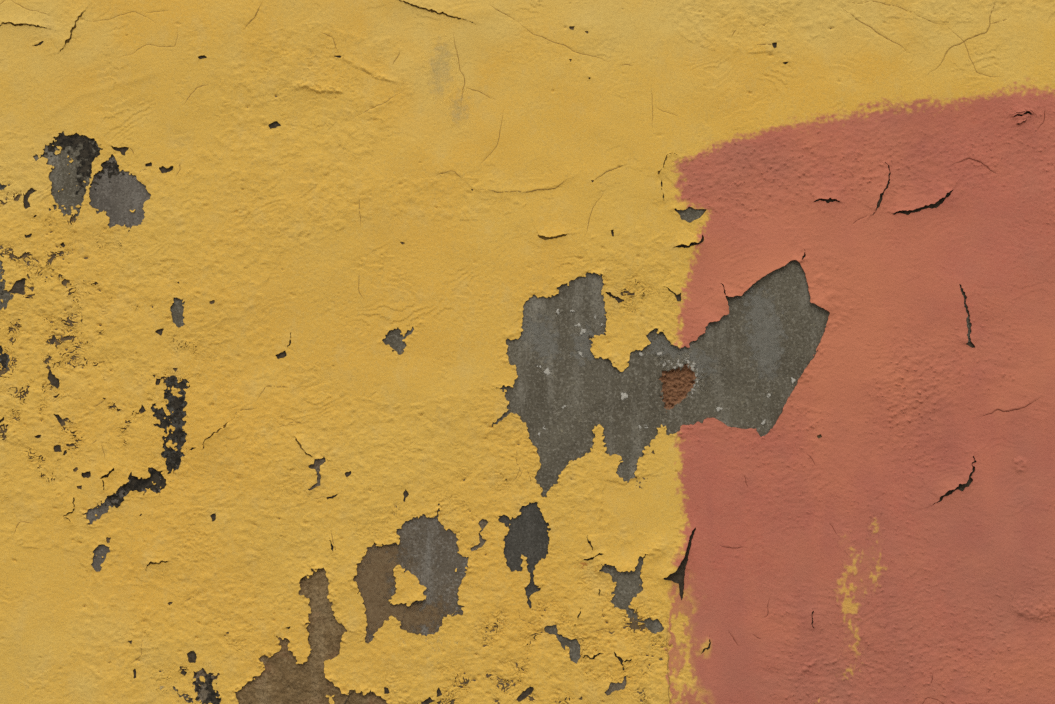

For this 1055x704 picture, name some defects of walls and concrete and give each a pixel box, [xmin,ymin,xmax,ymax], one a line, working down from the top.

crack [814,162,953,226]
peeling [0,242,110,440]
crack [959,284,972,342]
peeling [25,414,82,481]
peeling [103,398,146,445]
peeling [306,454,338,499]
peeling [348,249,838,672]
crack [933,456,976,505]
peeling [230,566,390,704]
peeling [596,538,671,702]
peeling [417,658,535,704]